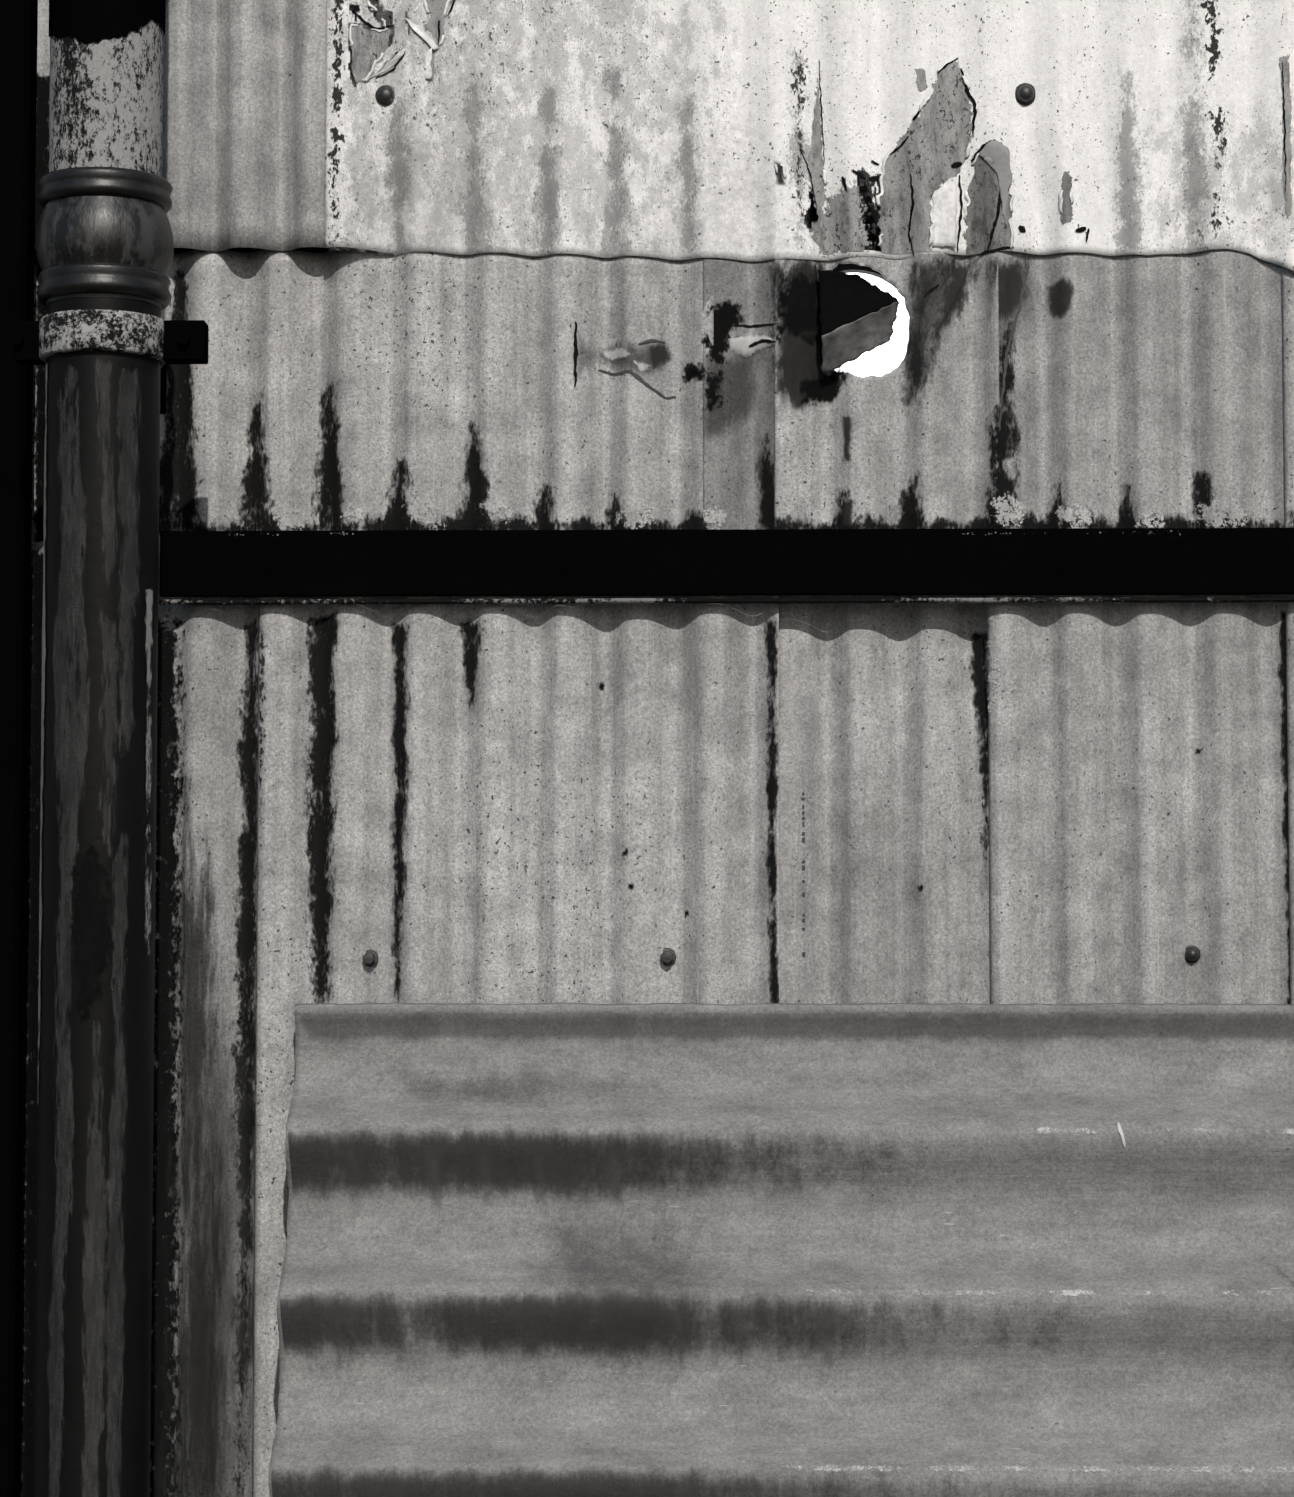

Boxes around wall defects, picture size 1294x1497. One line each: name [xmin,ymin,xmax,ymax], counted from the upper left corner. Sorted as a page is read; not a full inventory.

peeling [349,0,455,83]
peeling [774,162,787,184]
peeling [800,57,1026,256]
peeling [1058,171,1089,242]